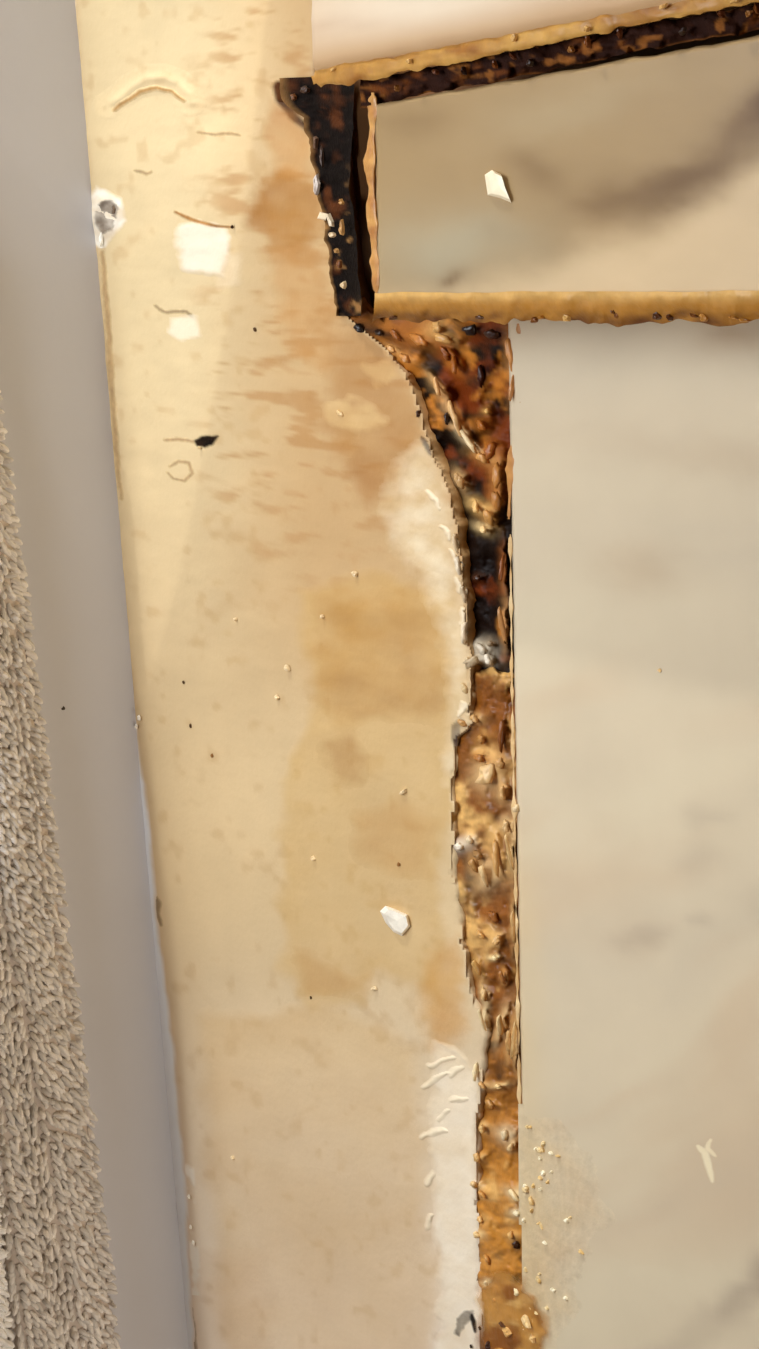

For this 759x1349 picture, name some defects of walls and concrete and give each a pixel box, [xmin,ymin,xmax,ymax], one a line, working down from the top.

water stain [191,565,481,1349]
rust [478,1272,546,1349]